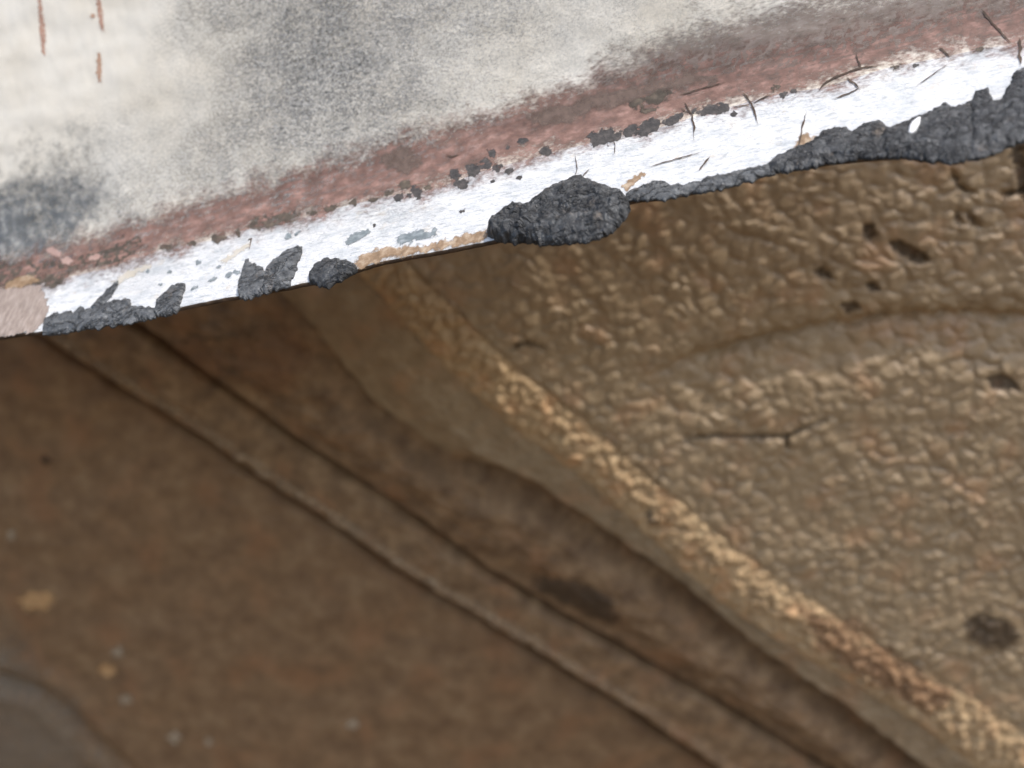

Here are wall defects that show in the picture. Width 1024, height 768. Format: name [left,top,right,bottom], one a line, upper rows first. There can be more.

water stain [0,171,142,289]
water stain [234,0,382,151]
water stain [211,145,432,244]
corrosion [354,230,488,269]
water stain [449,138,529,189]
corrosion [621,172,646,191]
water stain [532,68,738,148]
corrosion [795,133,815,147]
peeling [0,231,358,362]
crack [687,419,823,446]
peeling [98,362,635,707]